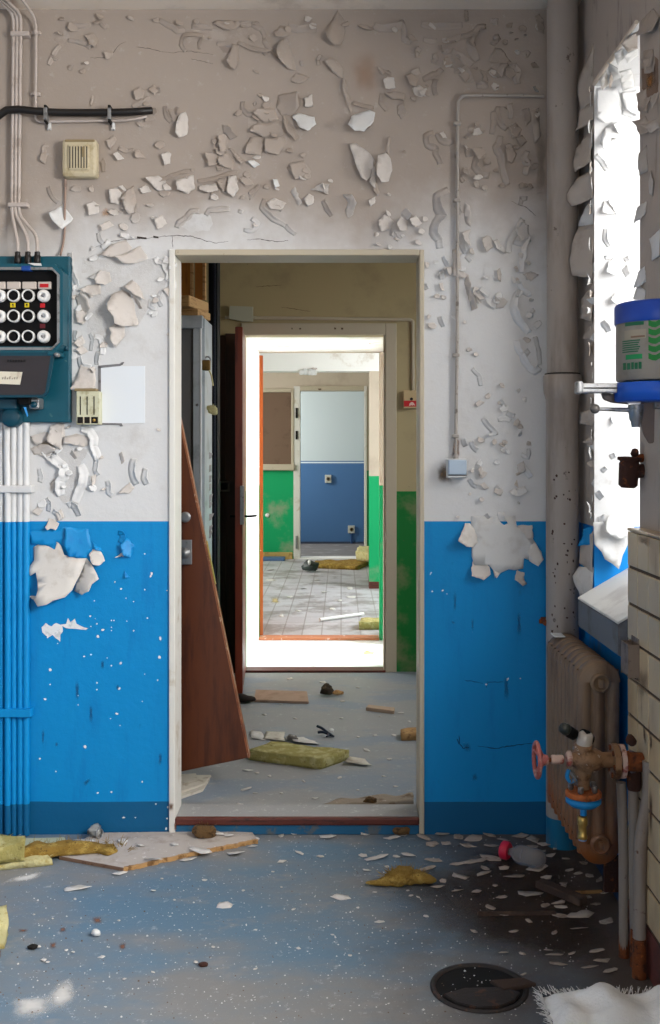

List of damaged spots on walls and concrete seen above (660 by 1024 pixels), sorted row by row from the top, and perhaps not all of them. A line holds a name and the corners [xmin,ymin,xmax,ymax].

peeling [46,186,73,229]
peeling [67,23,430,392]
peeling [374,103,542,375]
peeling [567,9,660,379]
spalling [42,615,134,644]
peeling [29,423,149,606]
peeling [456,347,544,586]
peeling [572,397,634,596]